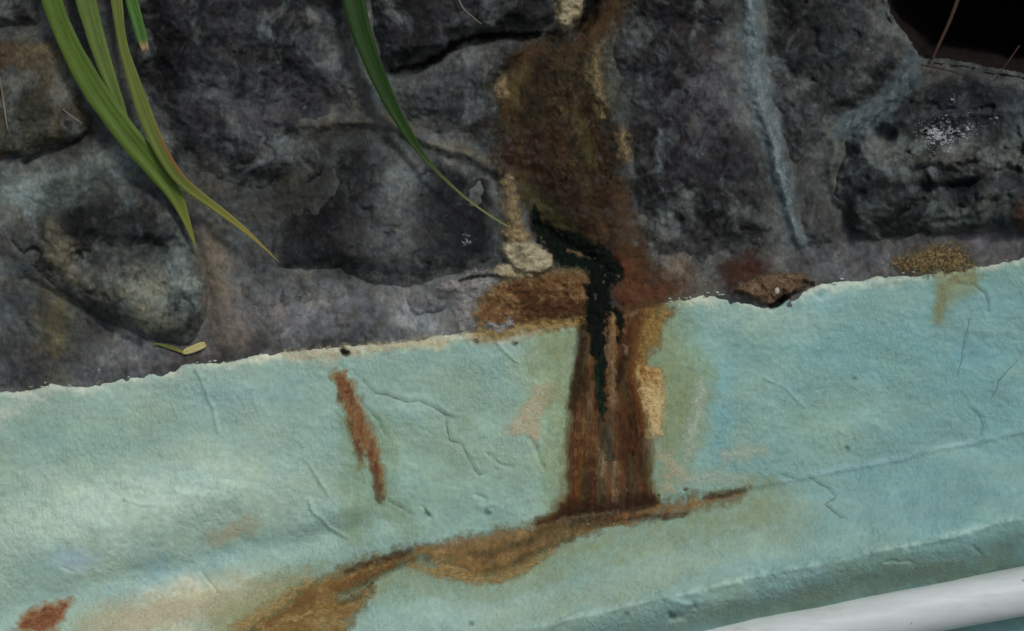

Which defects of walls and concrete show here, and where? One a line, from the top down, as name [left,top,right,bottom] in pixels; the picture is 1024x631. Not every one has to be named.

damp [433,0,660,334]
spalling [668,271,815,308]
rust [329,369,387,500]
rust [471,246,703,523]
rust [18,597,72,631]